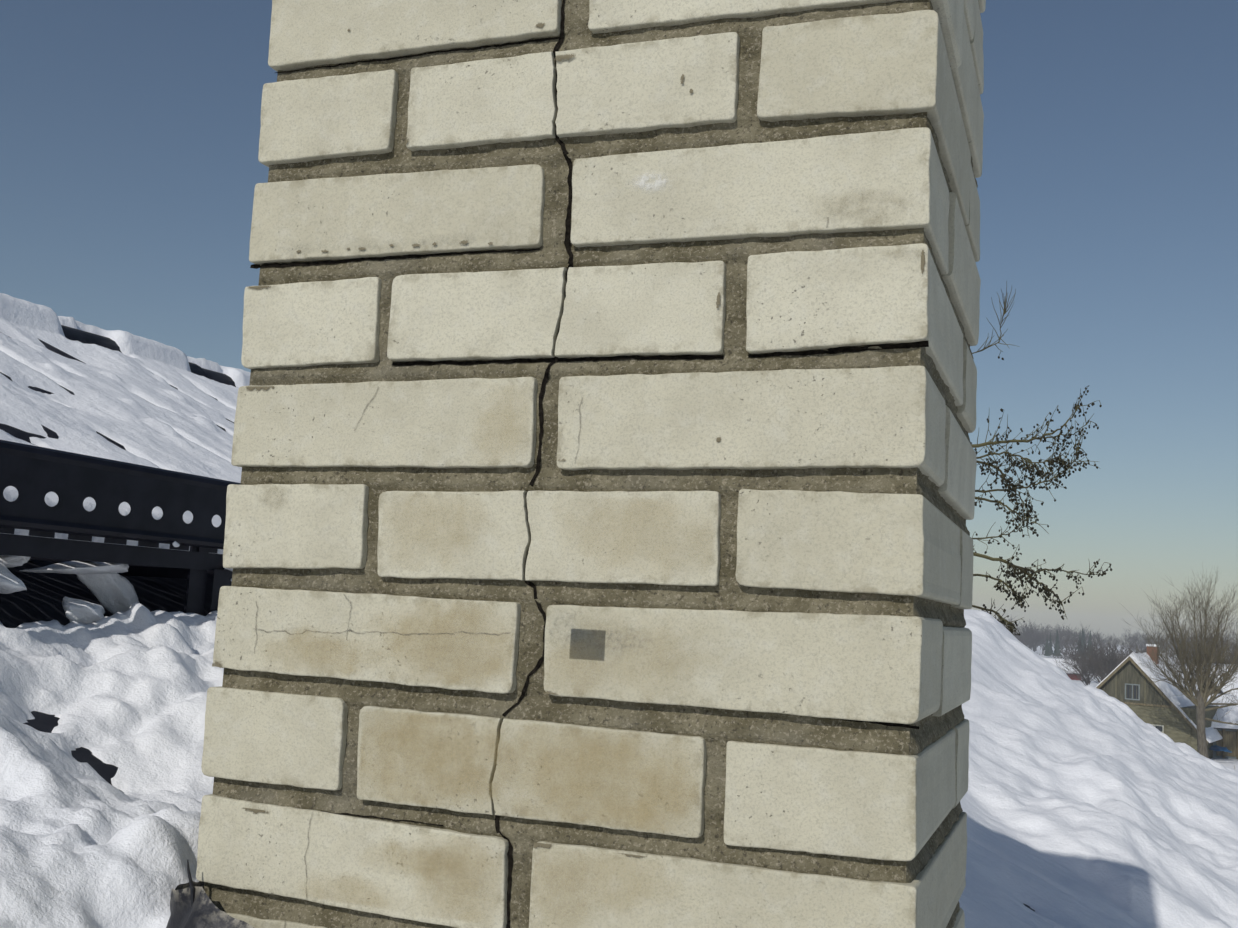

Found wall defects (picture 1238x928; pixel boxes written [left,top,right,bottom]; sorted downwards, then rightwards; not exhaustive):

crack [250,0,929,778]
crack [322,811,443,826]
crack [495,815,513,928]